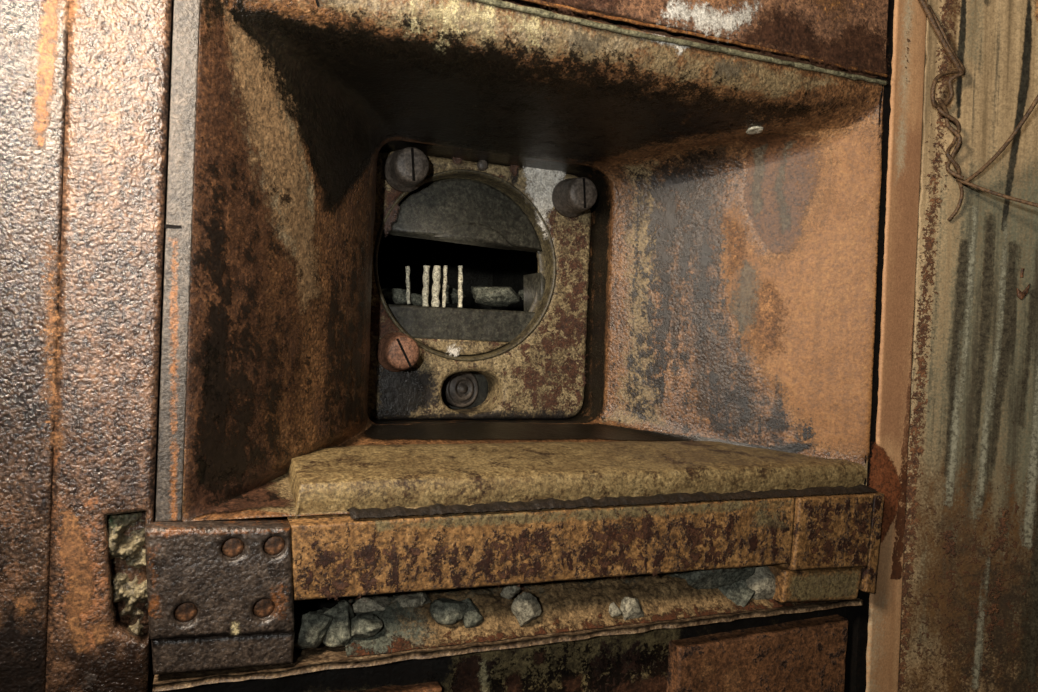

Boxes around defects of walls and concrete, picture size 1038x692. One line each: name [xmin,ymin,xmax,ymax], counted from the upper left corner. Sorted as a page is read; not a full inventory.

corrosion [33,0,82,146]
corrosion [185,1,427,519]
corrosion [39,233,67,448]
corrosion [598,0,956,692]
damp [944,0,1038,689]
corrosion [308,536,453,605]
corrosion [481,519,551,591]
corrosion [570,504,658,582]
corrosion [451,629,688,692]